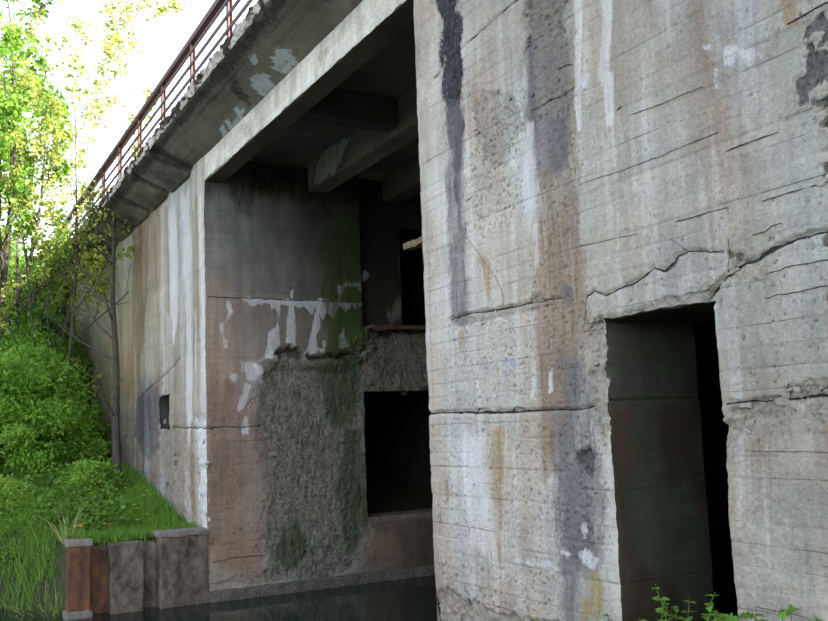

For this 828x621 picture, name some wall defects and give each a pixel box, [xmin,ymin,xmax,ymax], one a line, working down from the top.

corrosion [116,200,172,375]
damp [67,0,422,526]
spalling [364,329,429,395]
damp [426,0,474,338]
damp [514,0,560,275]
damp [559,0,642,203]
crack [581,207,828,330]
corrosion [772,0,807,39]
peeling [790,4,828,187]
peeling [804,224,828,254]
spalling [252,344,364,585]